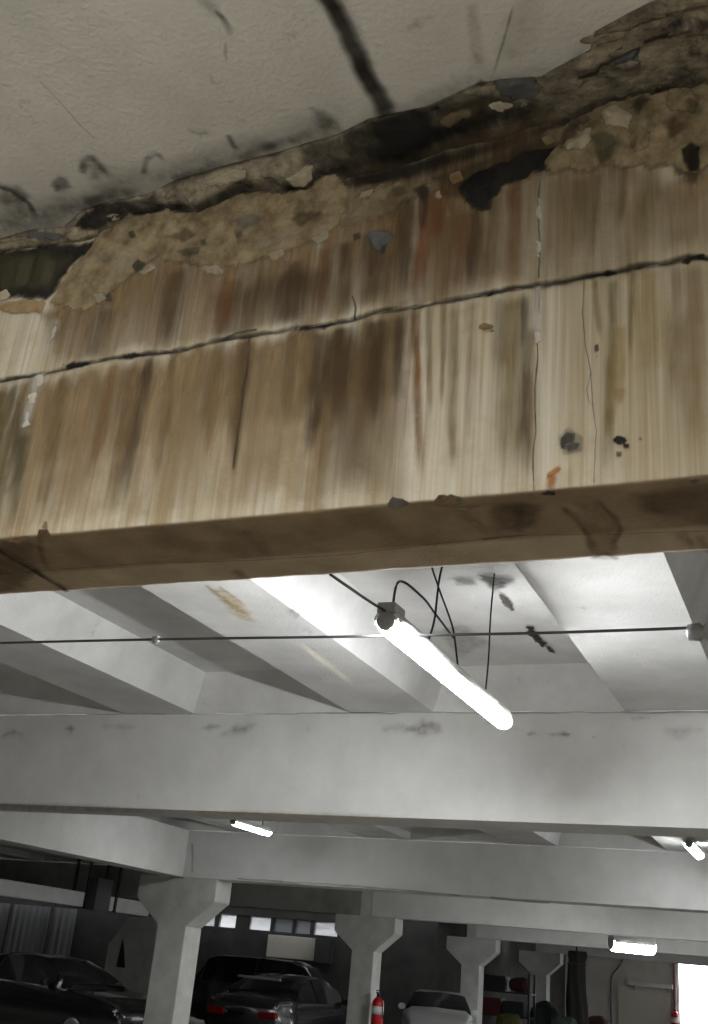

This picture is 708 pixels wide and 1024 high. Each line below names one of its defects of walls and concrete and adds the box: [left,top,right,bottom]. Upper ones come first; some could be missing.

peeling [0,83,708,314]
damp [47,89,664,345]
crack [0,182,708,433]
damp [11,312,403,478]
rust [548,467,560,488]
damp [458,575,514,611]
damp [526,626,554,653]